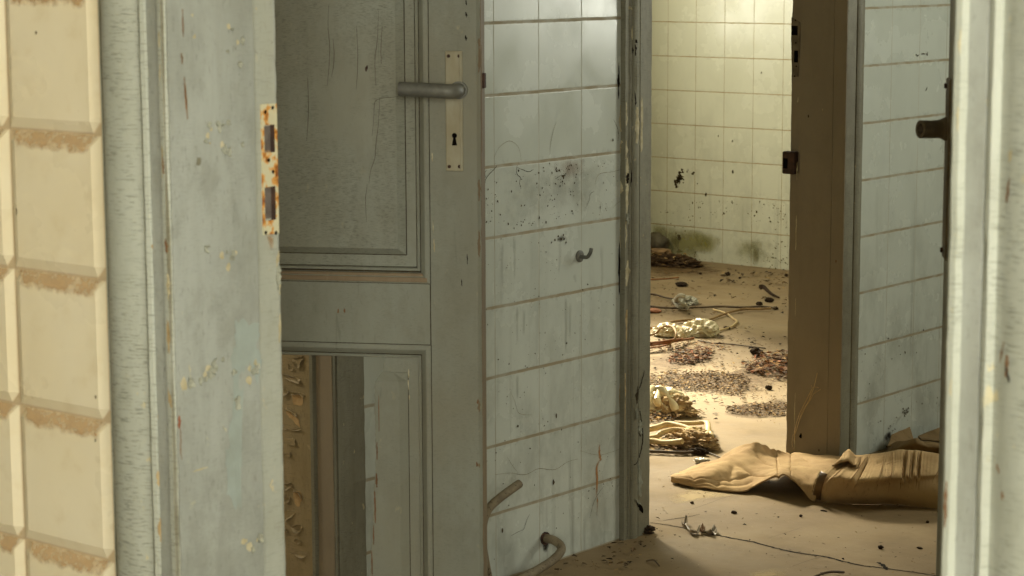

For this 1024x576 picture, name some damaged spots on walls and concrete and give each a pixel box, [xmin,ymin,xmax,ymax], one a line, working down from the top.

crack [496,371,645,497]
peeling [284,483,308,559]